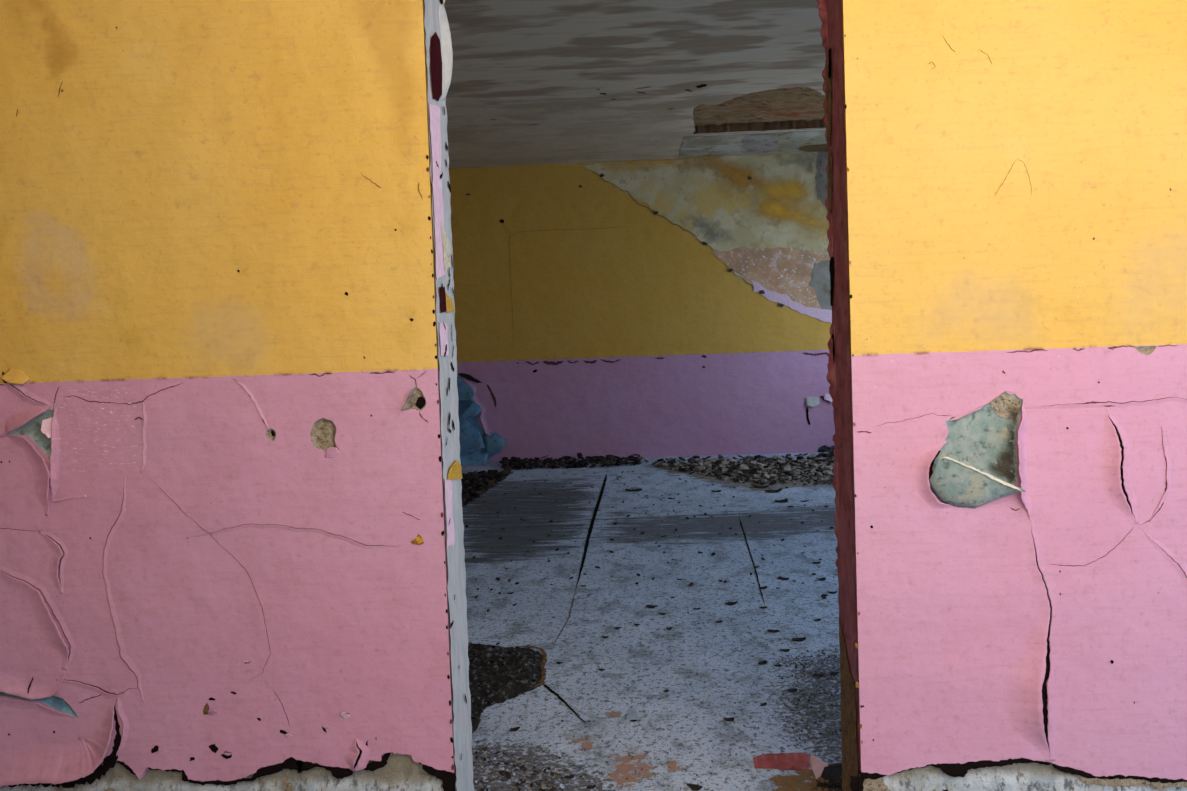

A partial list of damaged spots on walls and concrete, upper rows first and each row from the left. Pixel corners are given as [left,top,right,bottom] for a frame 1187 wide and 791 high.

peeling [426,0,455,359]
crack [418,143,470,198]
peeling [563,0,847,411]
crack [0,382,402,726]
crack [443,322,455,446]
peeling [439,373,506,564]
crack [554,474,607,644]
crack [739,518,766,609]
peeling [915,388,1033,523]
crack [1003,397,1187,762]
peeling [0,693,457,791]
peeling [753,618,1187,791]